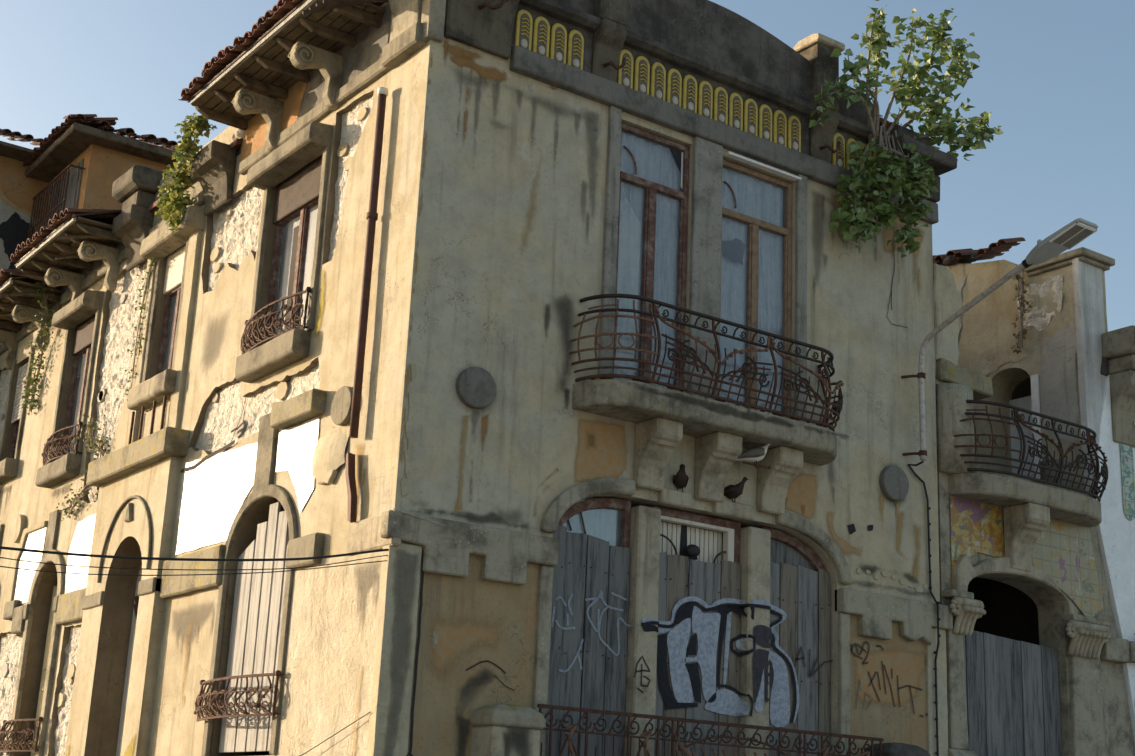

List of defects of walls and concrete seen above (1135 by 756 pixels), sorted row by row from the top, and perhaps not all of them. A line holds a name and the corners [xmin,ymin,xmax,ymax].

rust [444,40,507,81]
flaking render [328,96,373,262]
leakage [576,114,597,229]
peeling [0,199,36,271]
flaking render [208,187,262,292]
flaking render [90,259,148,462]
peeling [958,275,1080,449]
flaking render [88,486,99,502]
rust [455,411,488,510]
flaking render [0,633,23,756]
peeling [855,650,926,706]